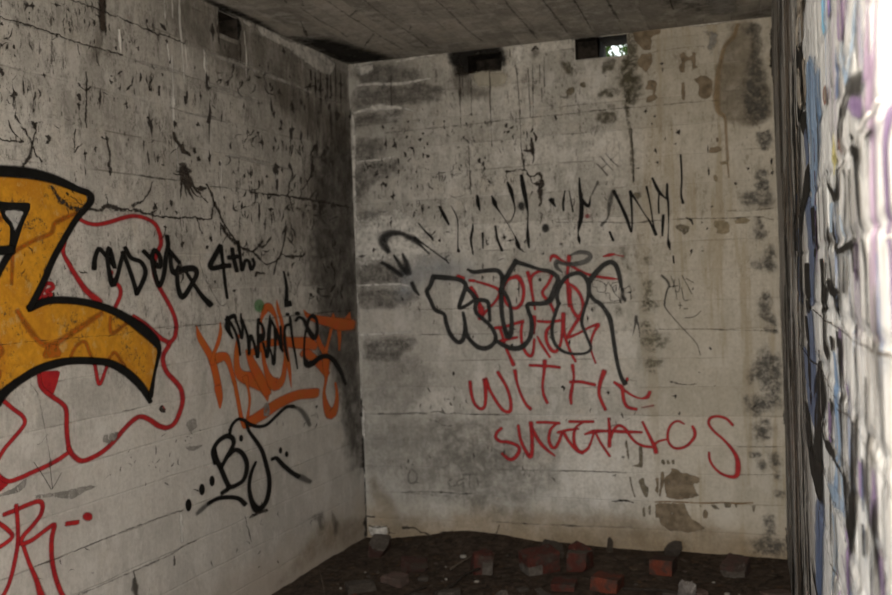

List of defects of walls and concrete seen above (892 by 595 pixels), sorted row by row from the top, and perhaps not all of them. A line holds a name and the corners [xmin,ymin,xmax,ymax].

water stain [620,32,641,181]
water stain [715,14,772,177]
crack [0,16,350,292]
water stain [745,170,771,205]
water stain [760,250,776,270]
water stain [760,293,777,333]
water stain [745,351,781,438]
peeling [621,440,737,533]